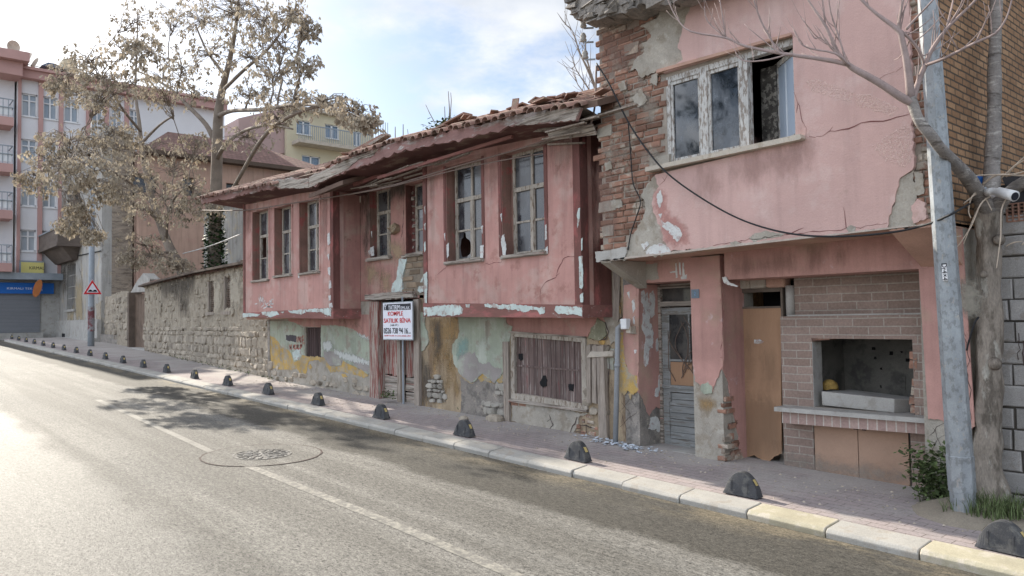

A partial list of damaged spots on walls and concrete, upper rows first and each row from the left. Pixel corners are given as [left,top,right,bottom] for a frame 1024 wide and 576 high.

flaking render [593,14,925,279]
crack [794,93,908,138]
peeling [387,191,470,323]
peeling [484,208,583,316]
flaking render [143,233,369,396]
water stain [422,319,466,404]
peeling [627,290,659,367]
peeling [648,416,660,432]
spalling [717,396,743,462]